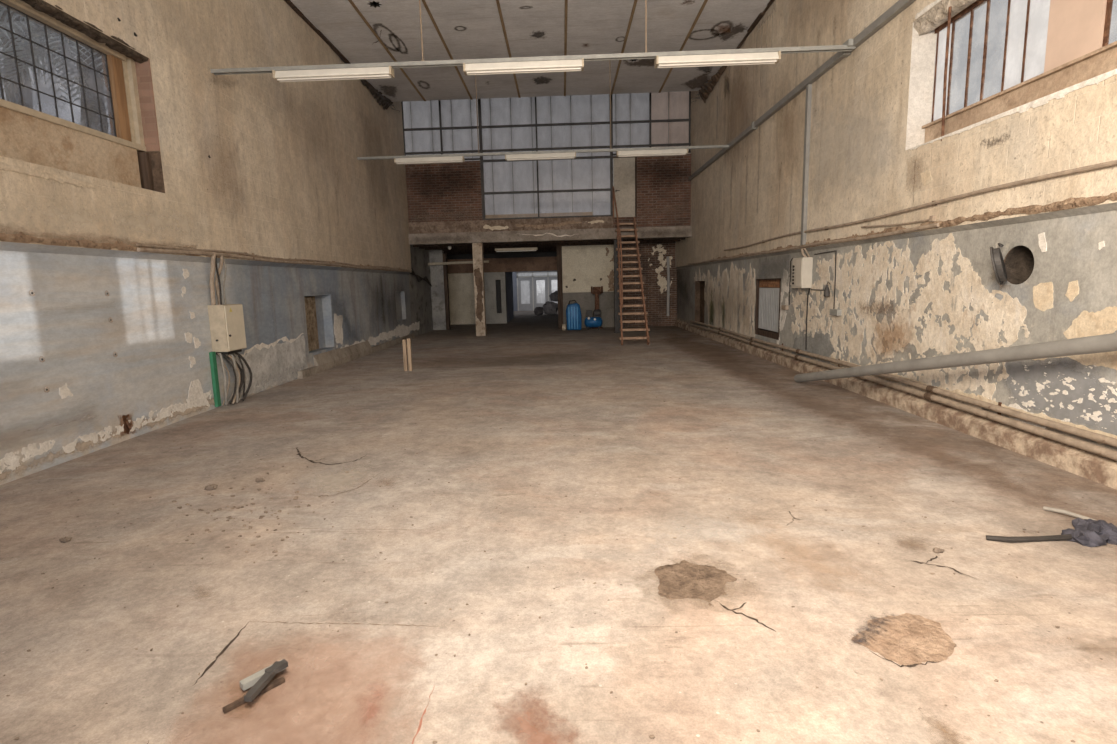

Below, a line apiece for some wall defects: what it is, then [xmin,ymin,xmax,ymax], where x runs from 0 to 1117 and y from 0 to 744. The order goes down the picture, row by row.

spalling [915,0,941,19]
spalling [0,232,407,297]
peeling [648,244,673,294]
peeling [334,314,420,349]
peeling [694,192,1117,444]
peeling [0,311,212,474]
peeling [237,335,308,397]
corrosion [118,414,135,435]
crack [194,621,424,685]